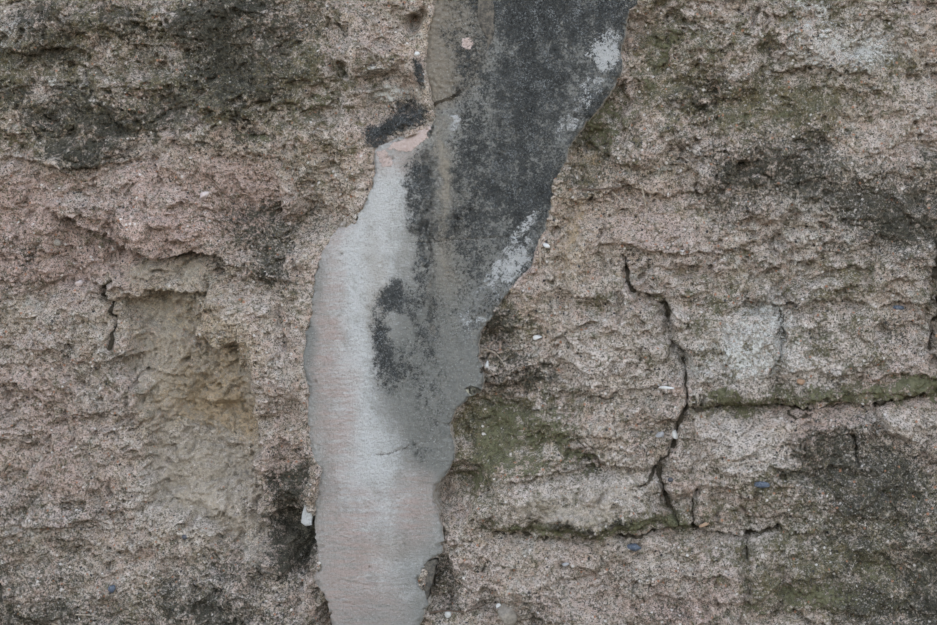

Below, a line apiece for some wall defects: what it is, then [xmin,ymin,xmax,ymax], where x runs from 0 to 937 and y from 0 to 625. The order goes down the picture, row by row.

water stain [362,0,637,406]
crack [625,262,636,293]
crack [659,301,671,317]
crack [927,242,937,350]
crack [774,304,785,347]
crack [764,403,837,420]
crack [866,393,927,407]
crack [637,356,776,559]
crack [495,530,548,542]
crack [612,528,657,539]